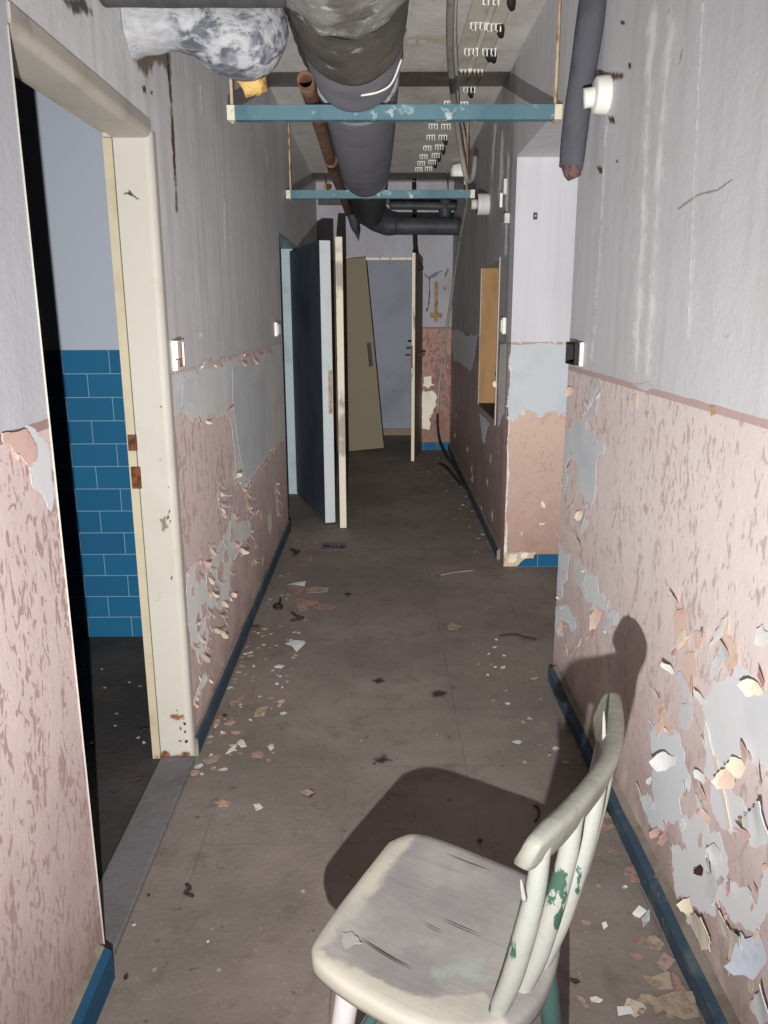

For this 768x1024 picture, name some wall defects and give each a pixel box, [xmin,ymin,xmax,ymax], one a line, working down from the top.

peeling [422,376,447,430]
peeling [2,424,54,511]
peeling [160,344,285,708]
peeling [454,340,619,656]
corrosion [161,710,190,757]
peeling [632,591,768,1024]
peeling [624,865,640,882]